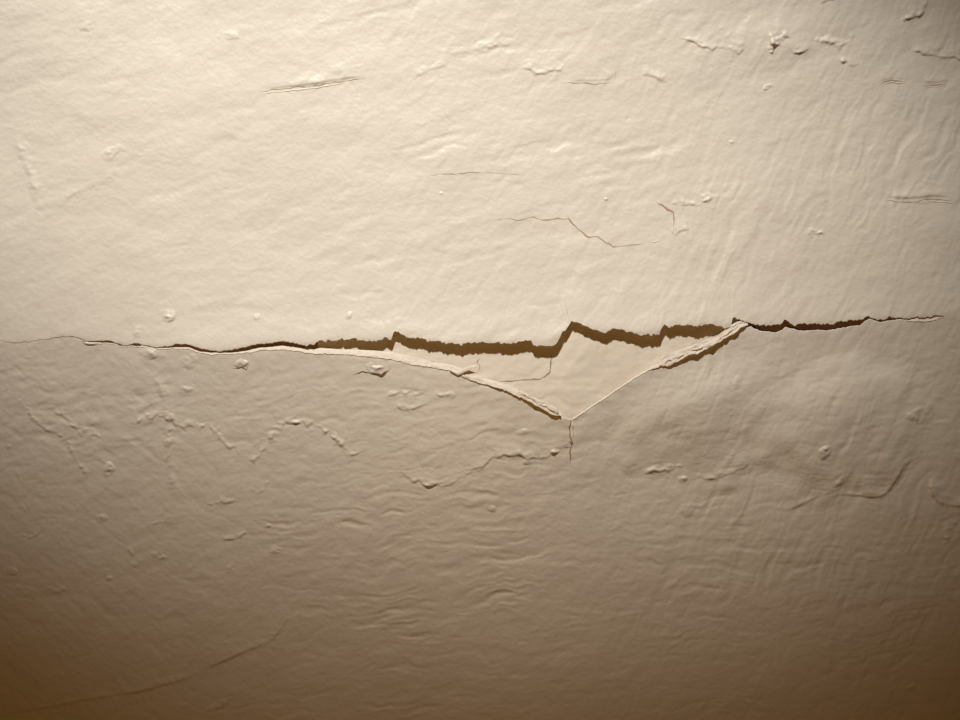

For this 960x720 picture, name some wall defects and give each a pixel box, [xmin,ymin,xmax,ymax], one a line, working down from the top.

crack [499,203,690,248]
crack [0,302,318,386]
peeling [318,282,748,451]
crack [747,280,944,362]
crack [564,420,574,466]